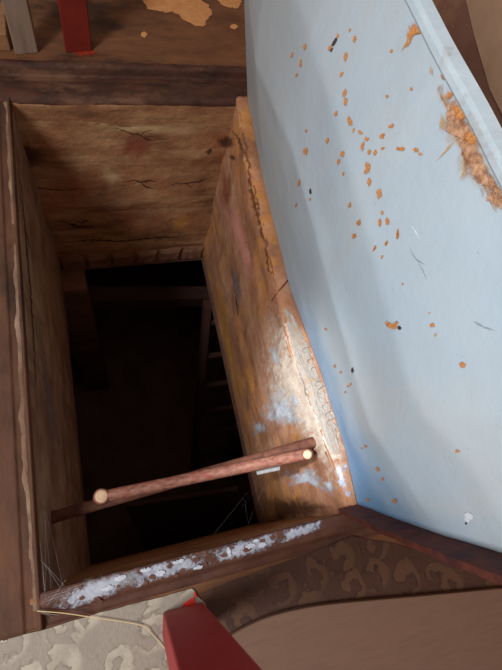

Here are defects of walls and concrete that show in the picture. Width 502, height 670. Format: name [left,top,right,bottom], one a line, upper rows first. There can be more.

water stain [269,324,340,462]